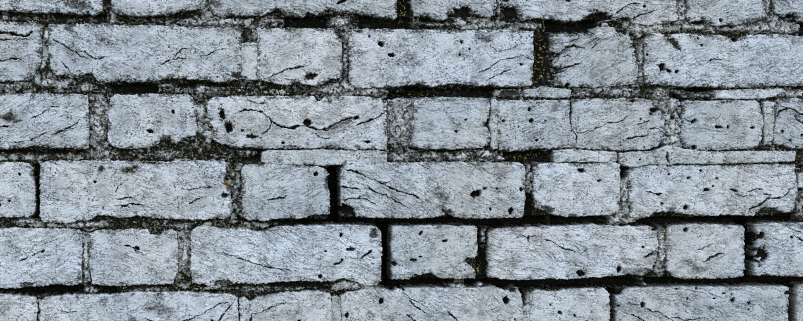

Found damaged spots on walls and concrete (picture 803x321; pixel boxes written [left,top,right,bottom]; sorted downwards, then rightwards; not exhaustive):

crack [569,100,663,139]